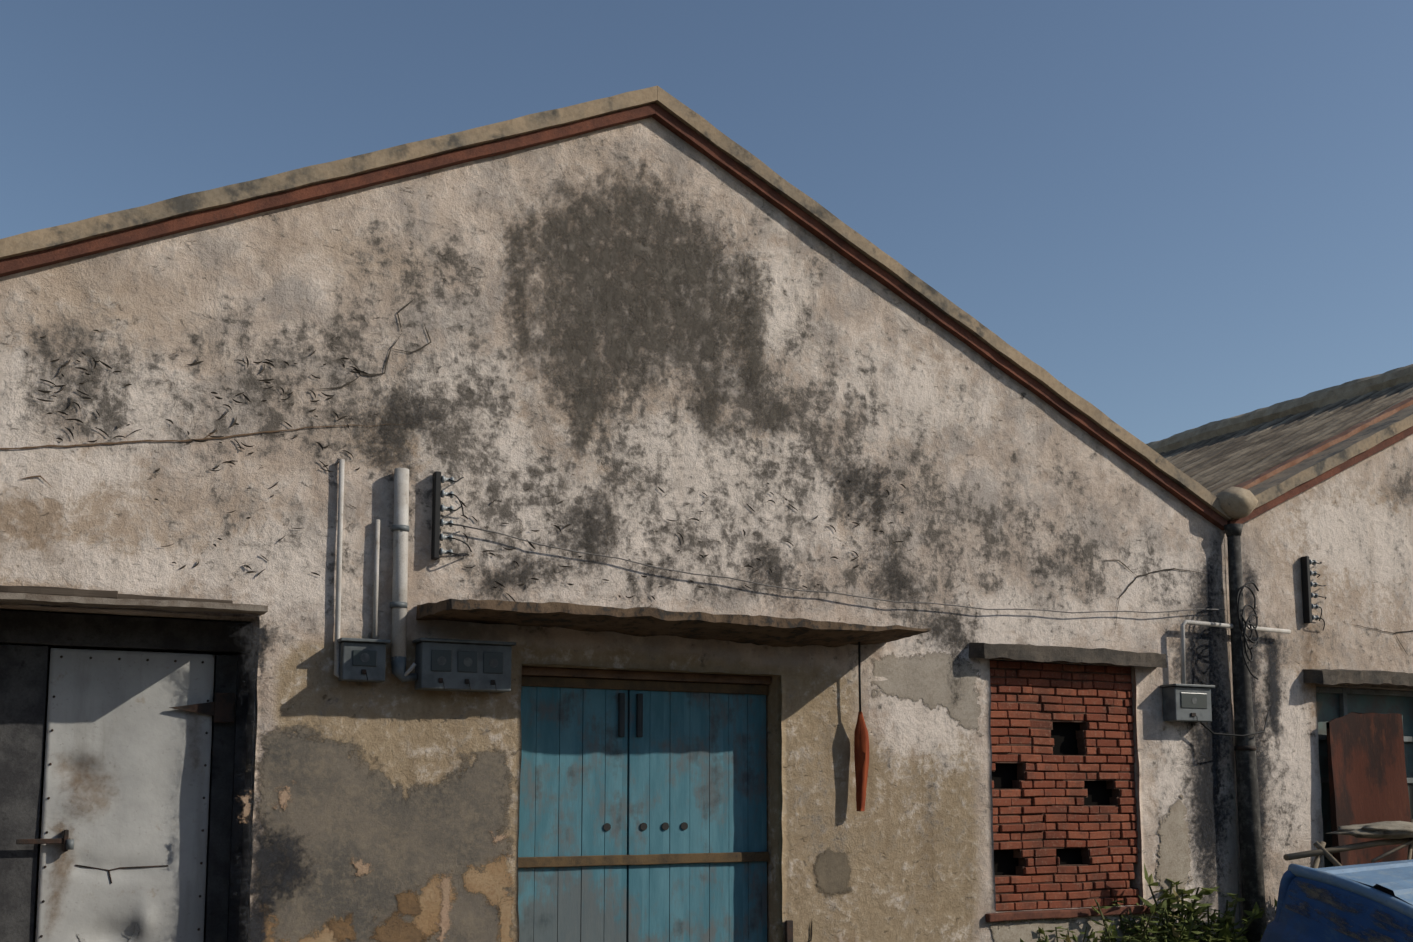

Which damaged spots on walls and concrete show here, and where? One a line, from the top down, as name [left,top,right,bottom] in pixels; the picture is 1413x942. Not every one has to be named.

crack [322,298,432,389]
leakage [504,160,796,457]
crack [0,423,409,487]
mould [818,447,890,521]
mould [475,539,540,597]
mould [742,557,821,611]
mould [870,549,918,600]
peeling [870,651,984,736]
leakage [1173,542,1230,918]
leakage [1243,563,1281,878]
flaking render [238,724,518,942]
corrosion [1326,712,1413,867]